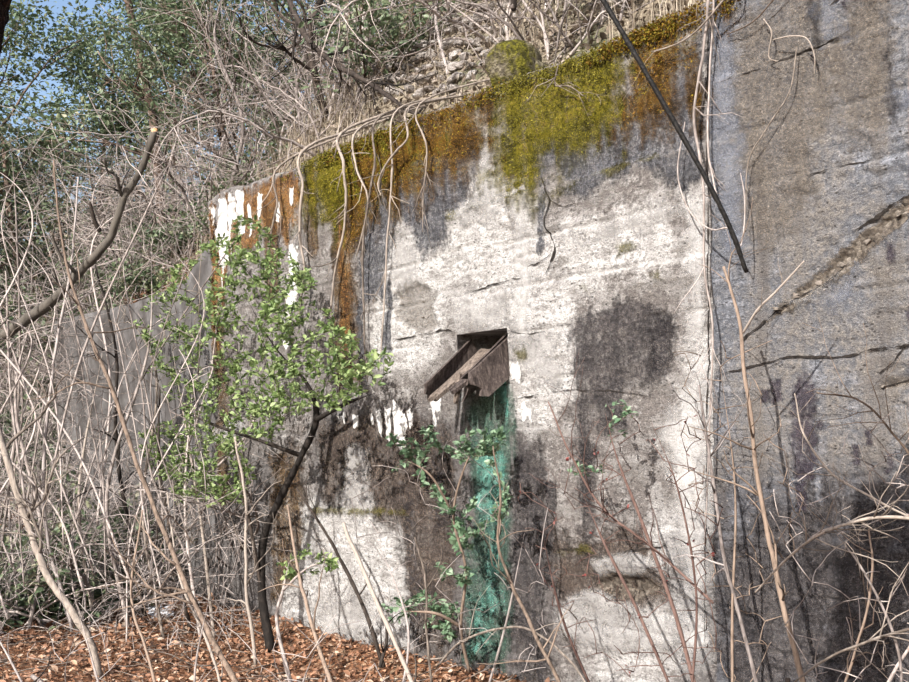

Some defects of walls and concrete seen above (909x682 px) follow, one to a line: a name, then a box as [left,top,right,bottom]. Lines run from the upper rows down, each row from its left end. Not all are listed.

rust [207,162,366,504]
damp [315,33,909,682]
crack [703,142,711,176]
crack [705,222,909,497]
spalling [743,194,909,340]
crack [807,155,886,176]